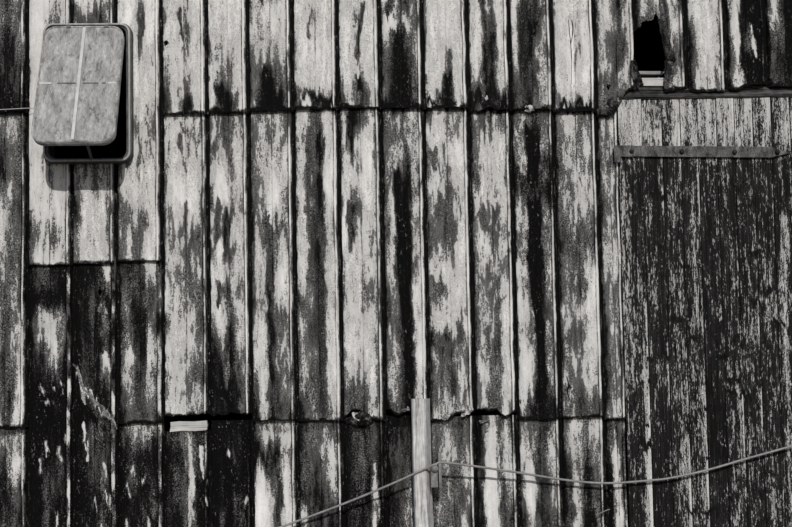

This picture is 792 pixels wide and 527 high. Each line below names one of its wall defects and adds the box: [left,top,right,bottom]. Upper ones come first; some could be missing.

water stain [0,36,25,125]
water stain [74,0,114,23]
water stain [136,3,145,58]
peeling [624,0,757,87]
peeling [608,97,792,152]
water stain [0,142,182,527]
water stain [151,0,634,527]
peeling [755,207,792,400]
peeling [644,386,653,527]
peeling [681,438,692,527]
peeling [701,386,710,527]